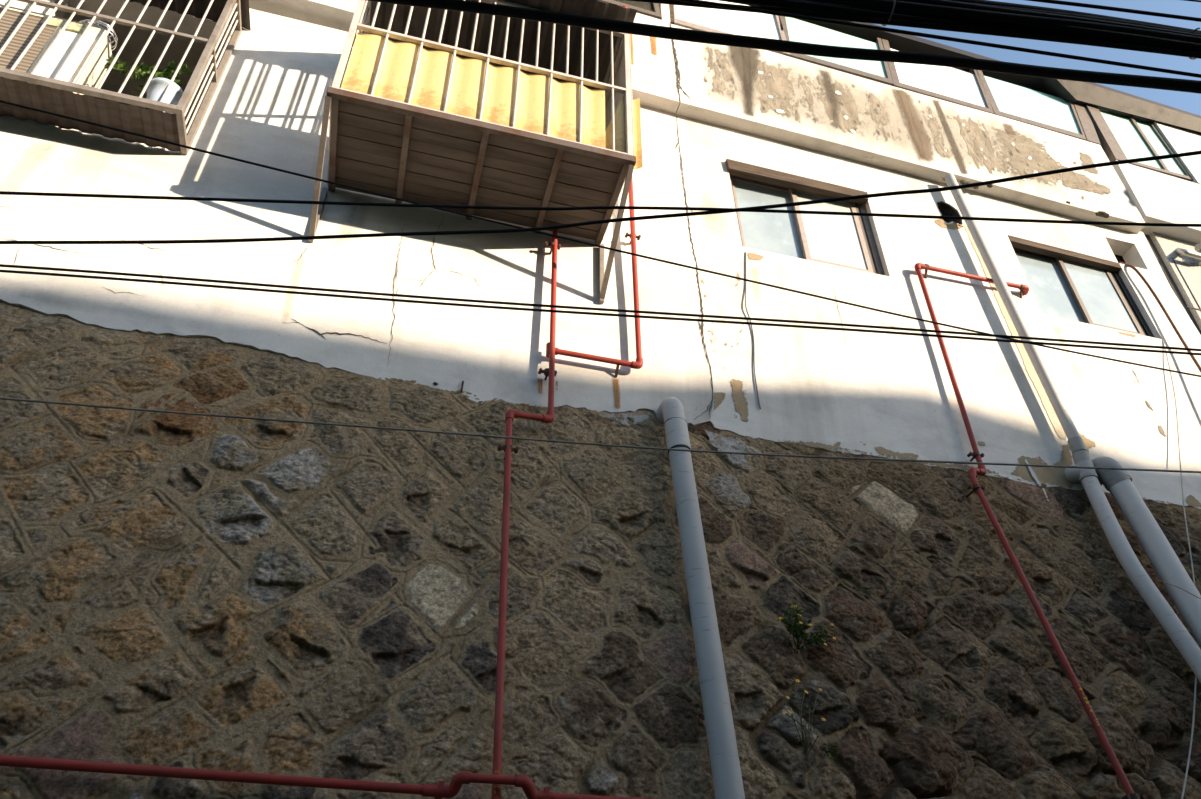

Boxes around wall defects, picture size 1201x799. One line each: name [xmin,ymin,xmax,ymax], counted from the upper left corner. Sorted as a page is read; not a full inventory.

leakage [805,71,848,118]
leakage [894,90,937,161]
leakage [934,100,1039,189]
crack [632,24,713,420]
crack [283,213,487,366]
peeling [709,320,749,421]
flaking render [778,219,1096,489]